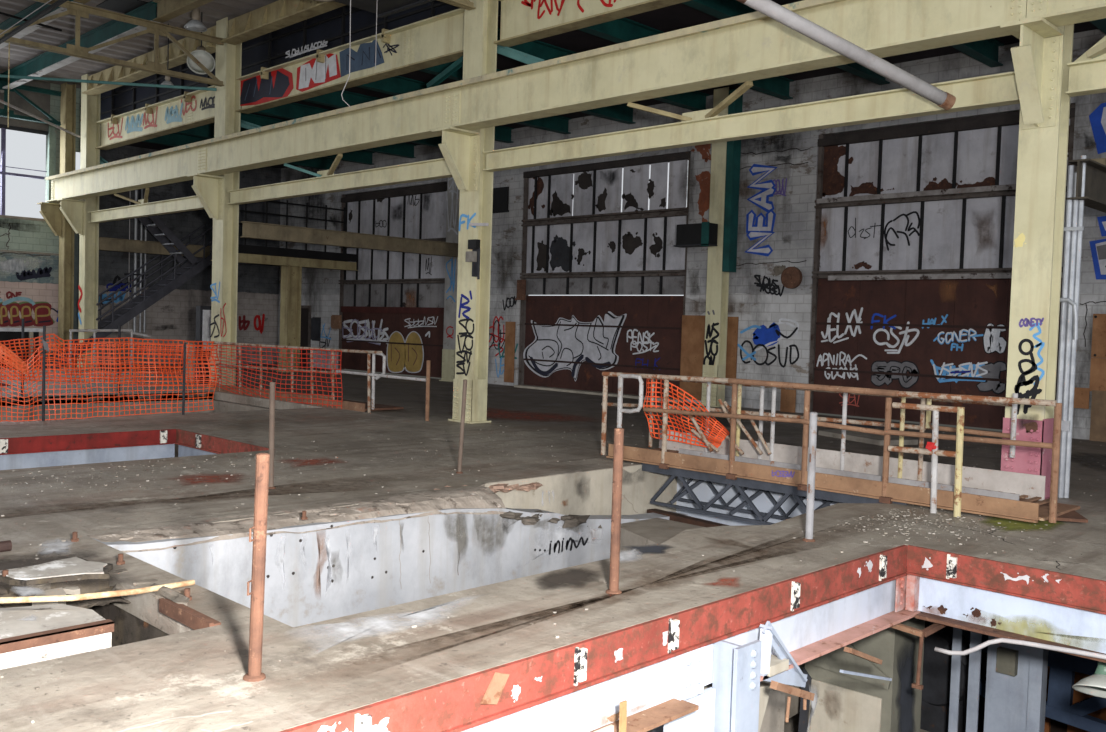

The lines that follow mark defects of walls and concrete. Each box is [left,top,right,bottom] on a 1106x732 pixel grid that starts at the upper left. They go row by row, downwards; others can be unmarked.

damp [449,518,514,554]
damp [539,526,602,555]
damp [620,545,671,561]
damp [316,540,335,589]
damp [540,569,596,588]
peeling [1000,572,1061,585]
damp [316,603,446,640]
damp [993,618,1081,645]
peeling [511,685,521,702]
peeling [317,722,352,732]
peeling [371,717,389,732]